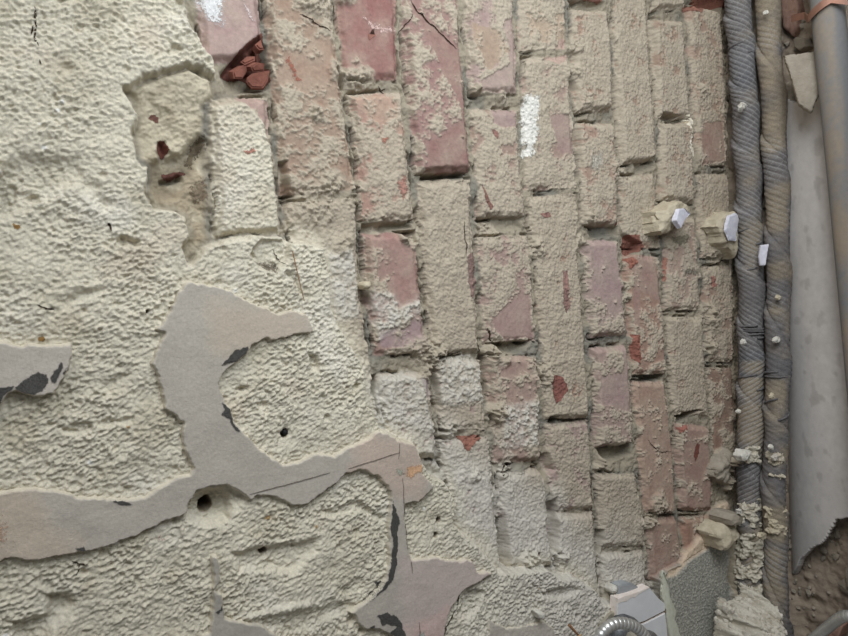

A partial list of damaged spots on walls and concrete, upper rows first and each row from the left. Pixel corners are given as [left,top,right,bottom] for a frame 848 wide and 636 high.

water stain [194,0,227,28]
crack [397,1,456,48]
water stain [519,93,540,159]
spalling [124,0,743,604]
peeling [0,281,492,636]